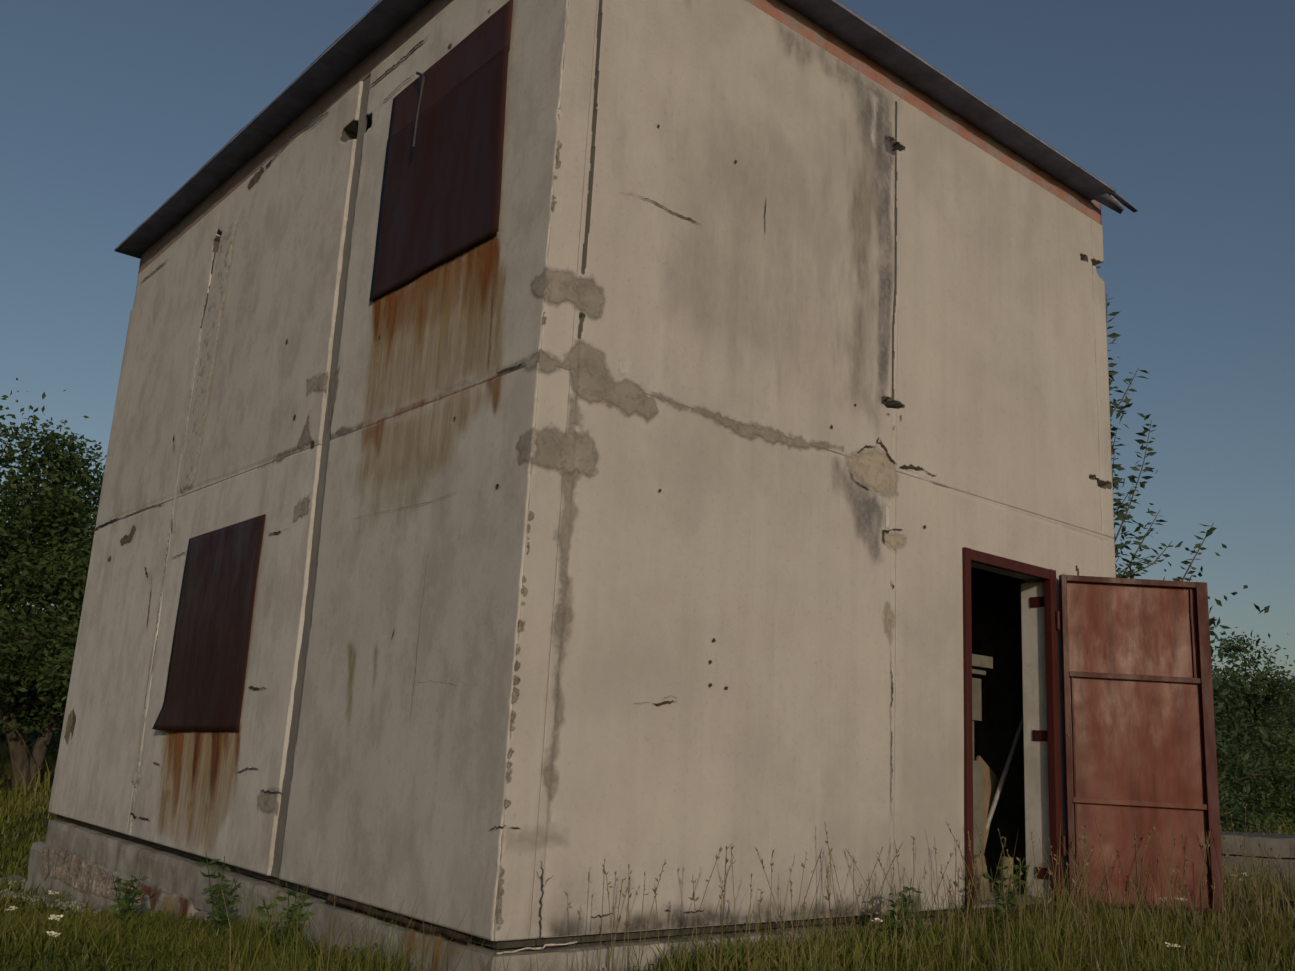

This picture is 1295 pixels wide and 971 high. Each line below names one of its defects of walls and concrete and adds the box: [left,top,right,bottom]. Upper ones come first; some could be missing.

water stain [855,79,893,250]
rust [366,236,505,463]
water stain [879,266,891,383]
water stain [848,484,889,552]
spalling [510,576,528,731]
rust [162,731,239,833]